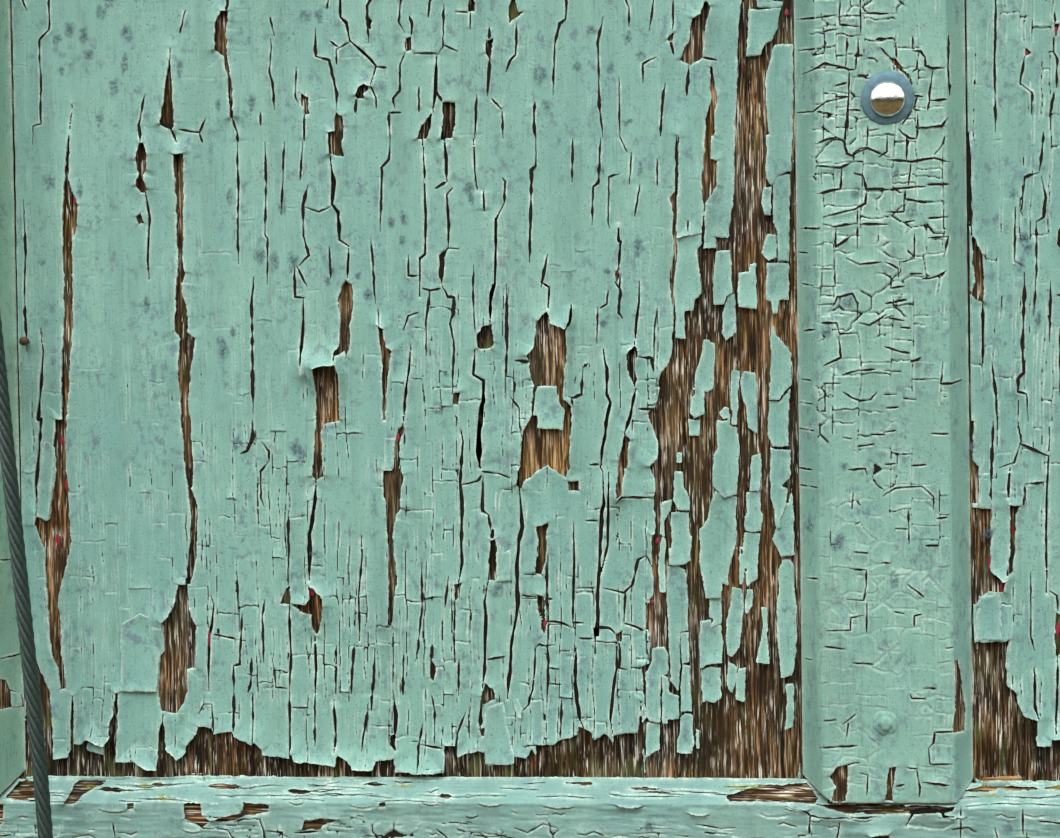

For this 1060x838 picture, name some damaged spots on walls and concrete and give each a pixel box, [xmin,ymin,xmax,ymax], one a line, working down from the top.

crack [22,0,50,145]
crack [137,95,205,143]
crack [144,195,152,279]
crack [158,0,716,783]
peeling [35,0,894,814]
peeling [953,418,1060,818]
crack [64,644,114,751]
crack [185,816,513,838]
crack [896,731,962,838]
crack [1022,811,1060,838]